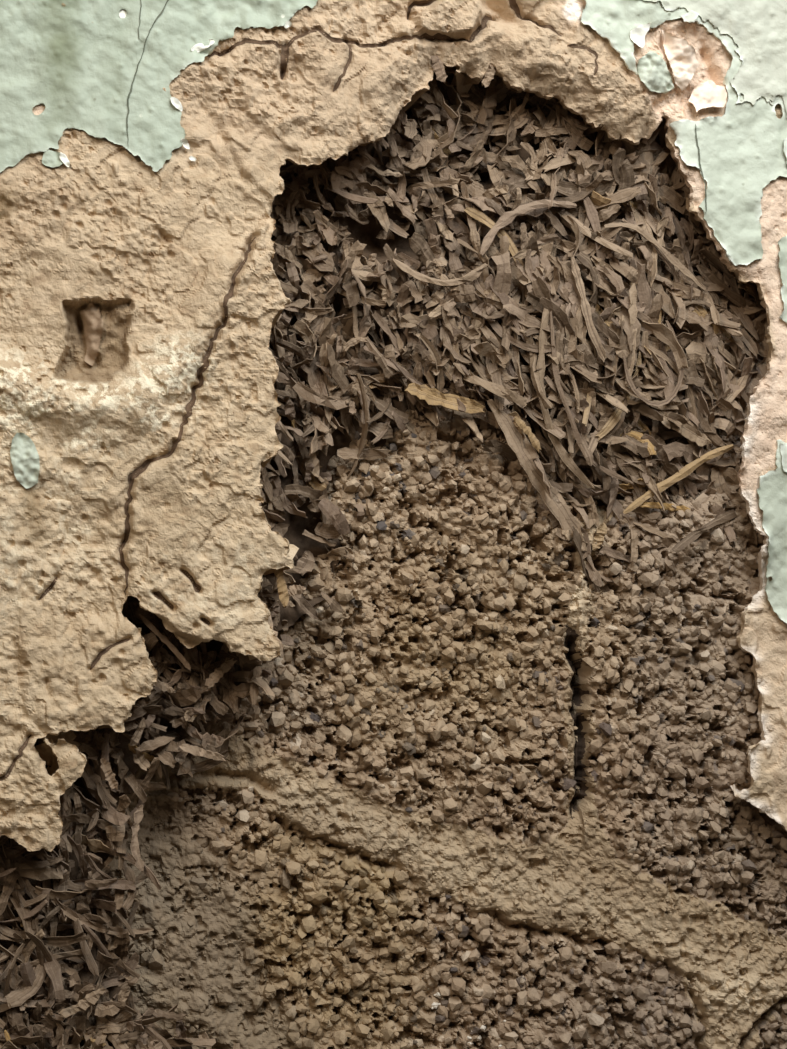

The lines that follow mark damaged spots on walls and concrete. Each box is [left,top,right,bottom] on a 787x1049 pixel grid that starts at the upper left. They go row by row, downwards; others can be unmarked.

peeling [212,0,732,121]
crack [119,237,256,595]
peeling [0,29,787,852]